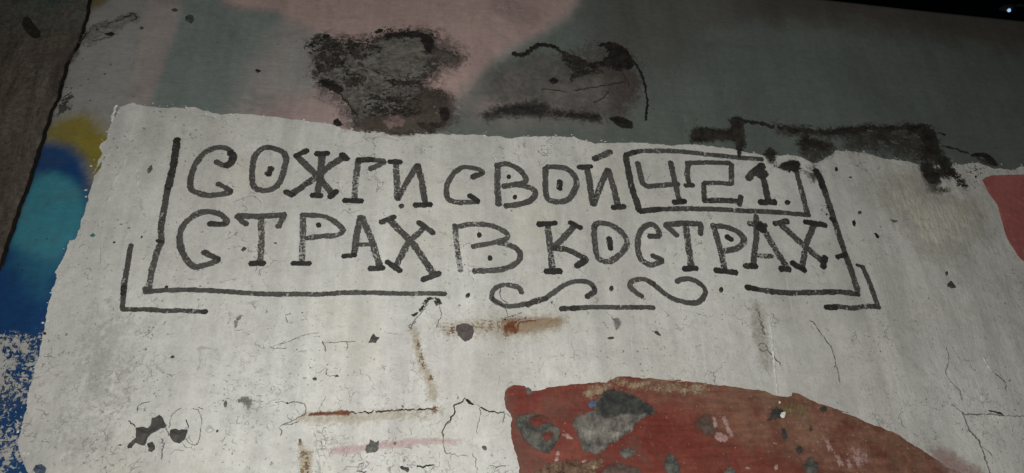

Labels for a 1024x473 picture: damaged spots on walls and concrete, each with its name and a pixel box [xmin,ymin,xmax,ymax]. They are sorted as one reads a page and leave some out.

spalling [119,401,202,458]
rust [309,321,438,421]
crack [416,398,510,469]
rust [472,315,561,339]
spalling [516,377,710,473]
crack [945,348,1021,473]